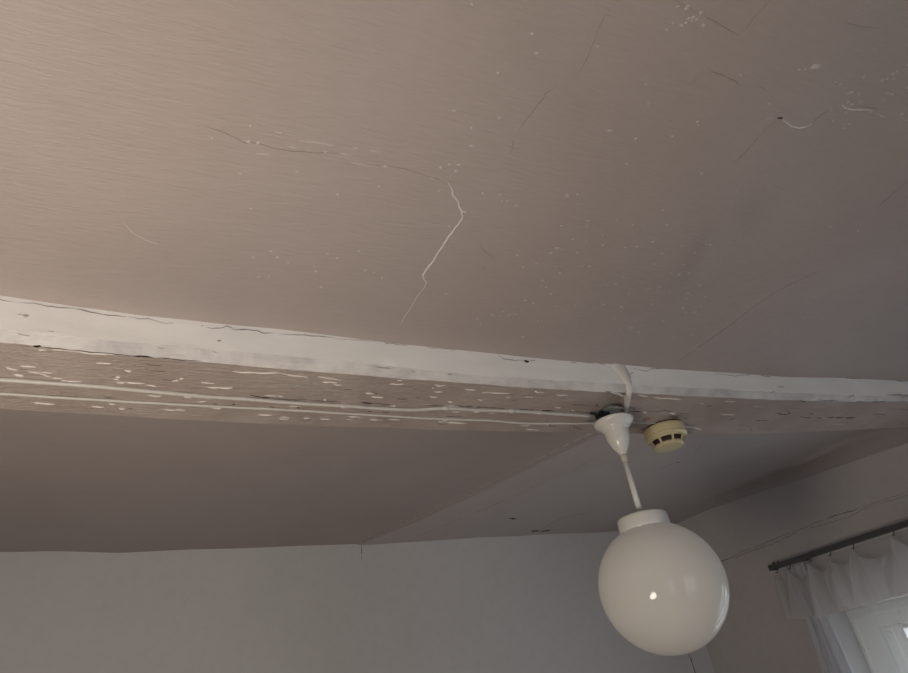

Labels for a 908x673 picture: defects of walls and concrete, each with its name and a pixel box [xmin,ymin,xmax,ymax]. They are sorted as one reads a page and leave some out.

crack [735,104,885,162]
crack [201,125,467,345]
crack [0,299,166,324]
peeling [6,363,184,410]
peeling [232,371,305,397]